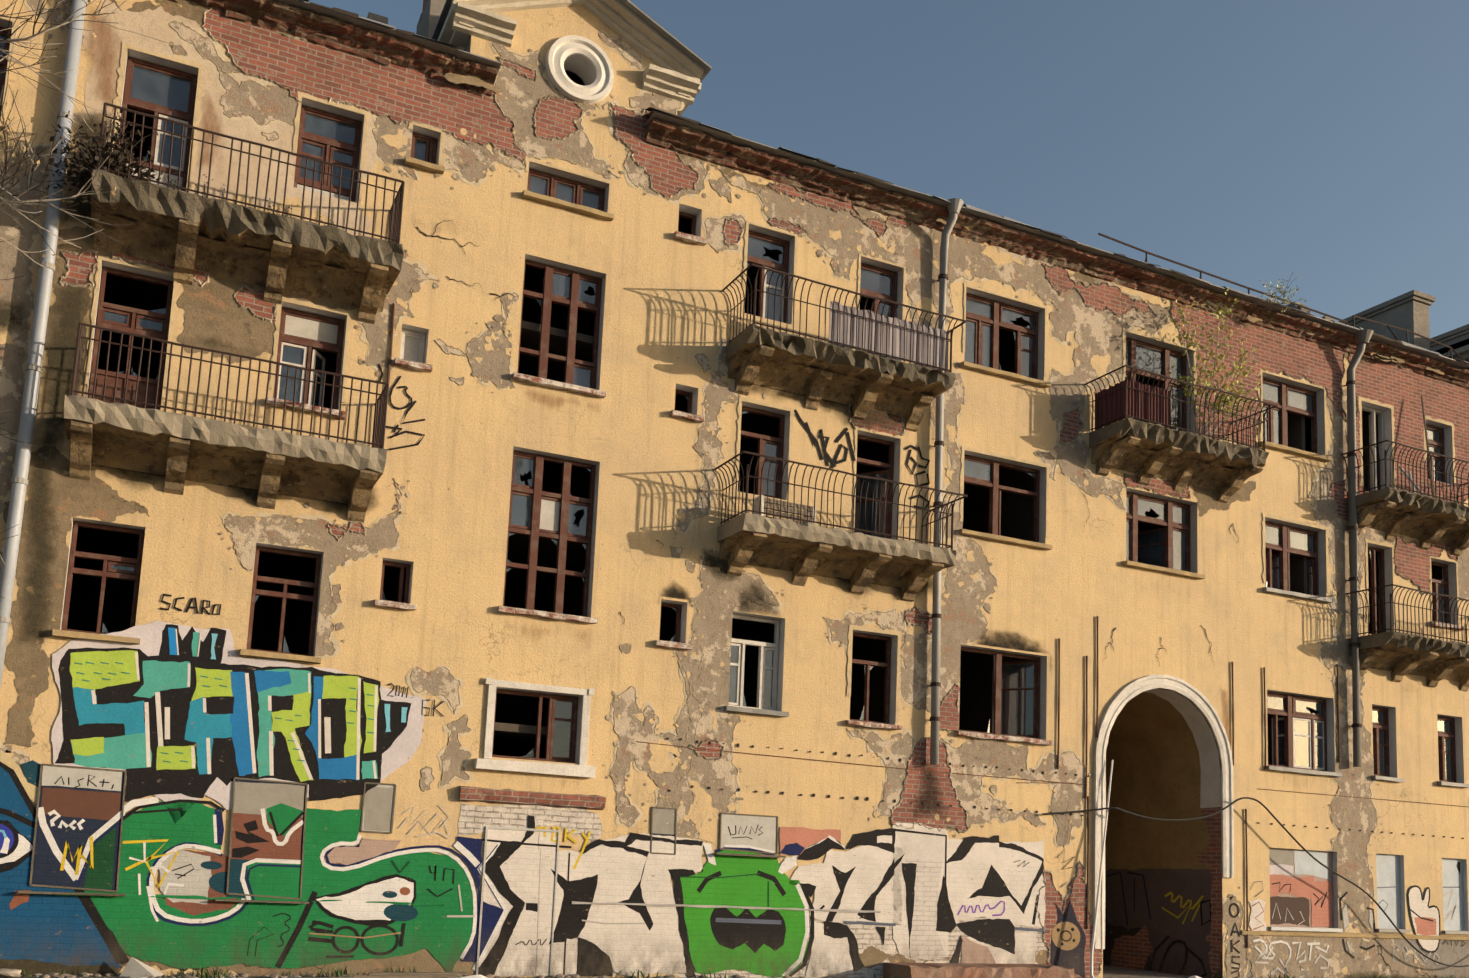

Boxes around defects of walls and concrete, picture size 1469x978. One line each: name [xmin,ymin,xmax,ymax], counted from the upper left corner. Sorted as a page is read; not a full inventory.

mould [67,115,110,221]
flaking render [58,0,942,328]
water stain [24,286,89,640]
flaking render [348,249,440,376]
crack [416,220,518,301]
flaking render [434,290,521,393]
flaking render [1355,356,1469,504]
flaking render [218,478,411,660]
flaking render [602,332,784,843]
flaking render [817,362,1155,978]
flaking render [945,234,1438,978]
flaking render [1357,527,1469,637]